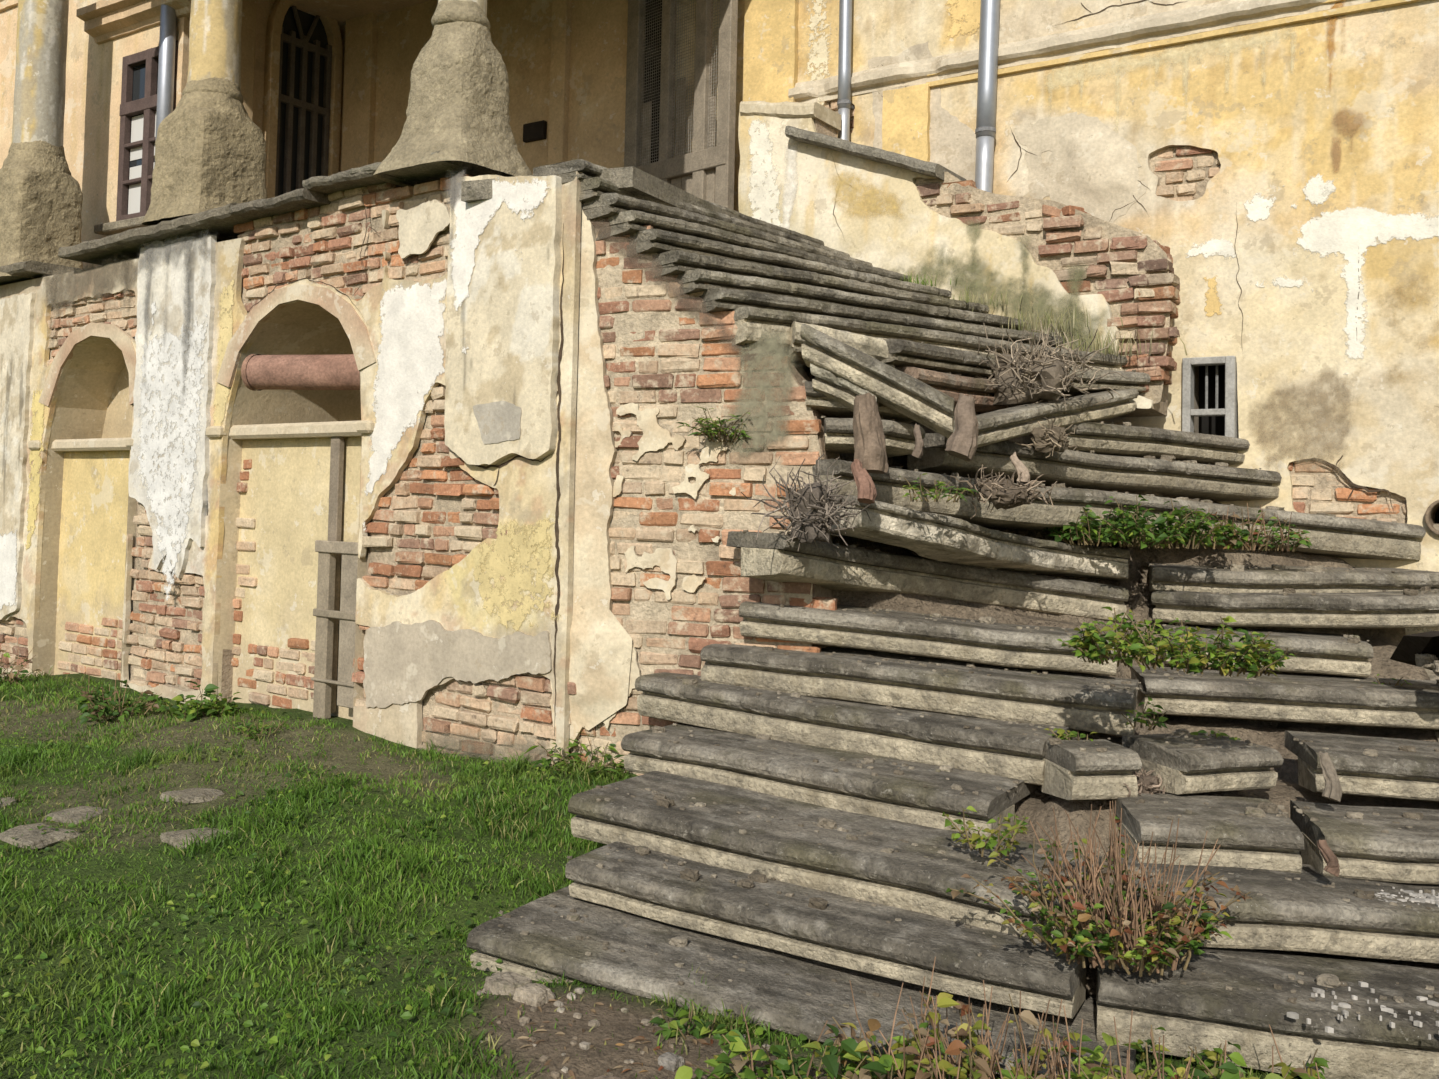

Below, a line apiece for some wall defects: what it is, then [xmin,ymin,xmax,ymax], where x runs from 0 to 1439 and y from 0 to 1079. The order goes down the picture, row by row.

peeling [805,0,831,81]
flaking render [868,41,933,69]
peeling [945,0,981,38]
crack [1054,0,1186,26]
flaking render [815,97,855,135]
flaking render [872,75,1223,392]
peeling [1244,173,1439,374]
flaking render [0,174,577,766]
flaking render [1288,459,1408,523]